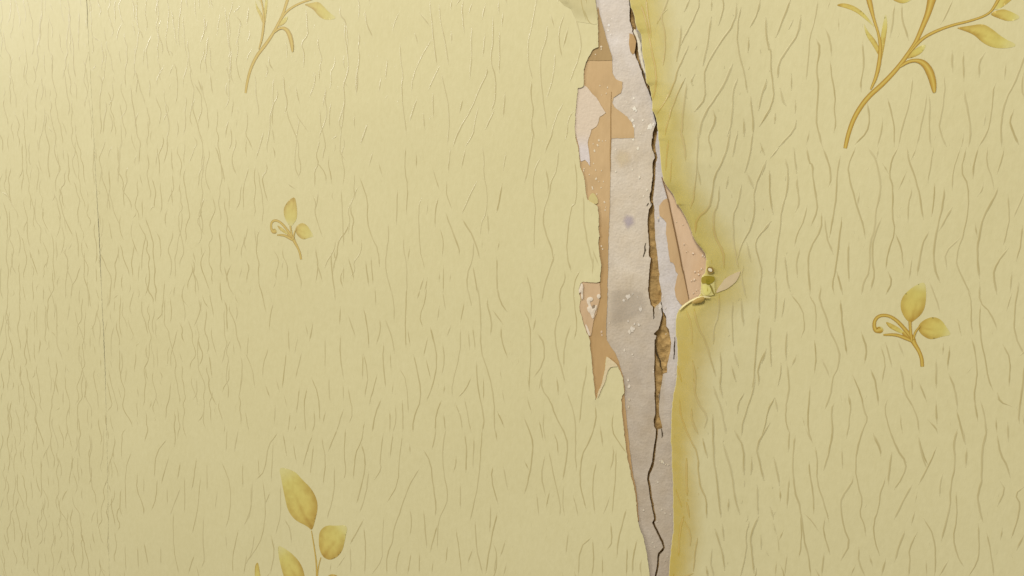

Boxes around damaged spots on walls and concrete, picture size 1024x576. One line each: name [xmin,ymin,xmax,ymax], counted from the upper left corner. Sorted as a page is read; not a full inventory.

flaking render [559,0,682,576]
crack [629,0,675,576]
water stain [630,0,717,275]
water stain [669,295,703,576]